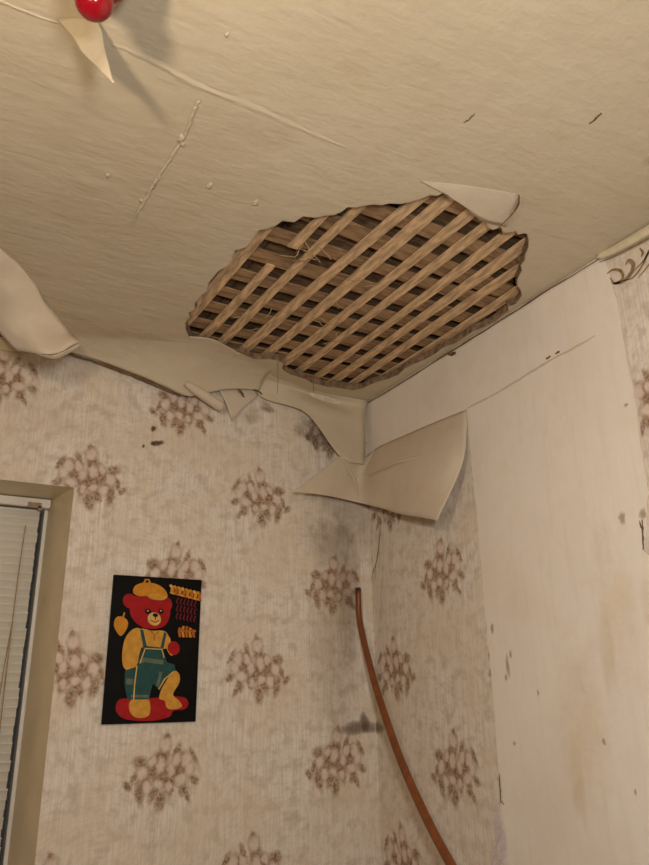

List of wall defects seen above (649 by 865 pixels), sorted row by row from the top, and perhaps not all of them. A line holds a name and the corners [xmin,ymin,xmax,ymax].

crack [131,99,202,227]
flaking render [230,181,649,865]